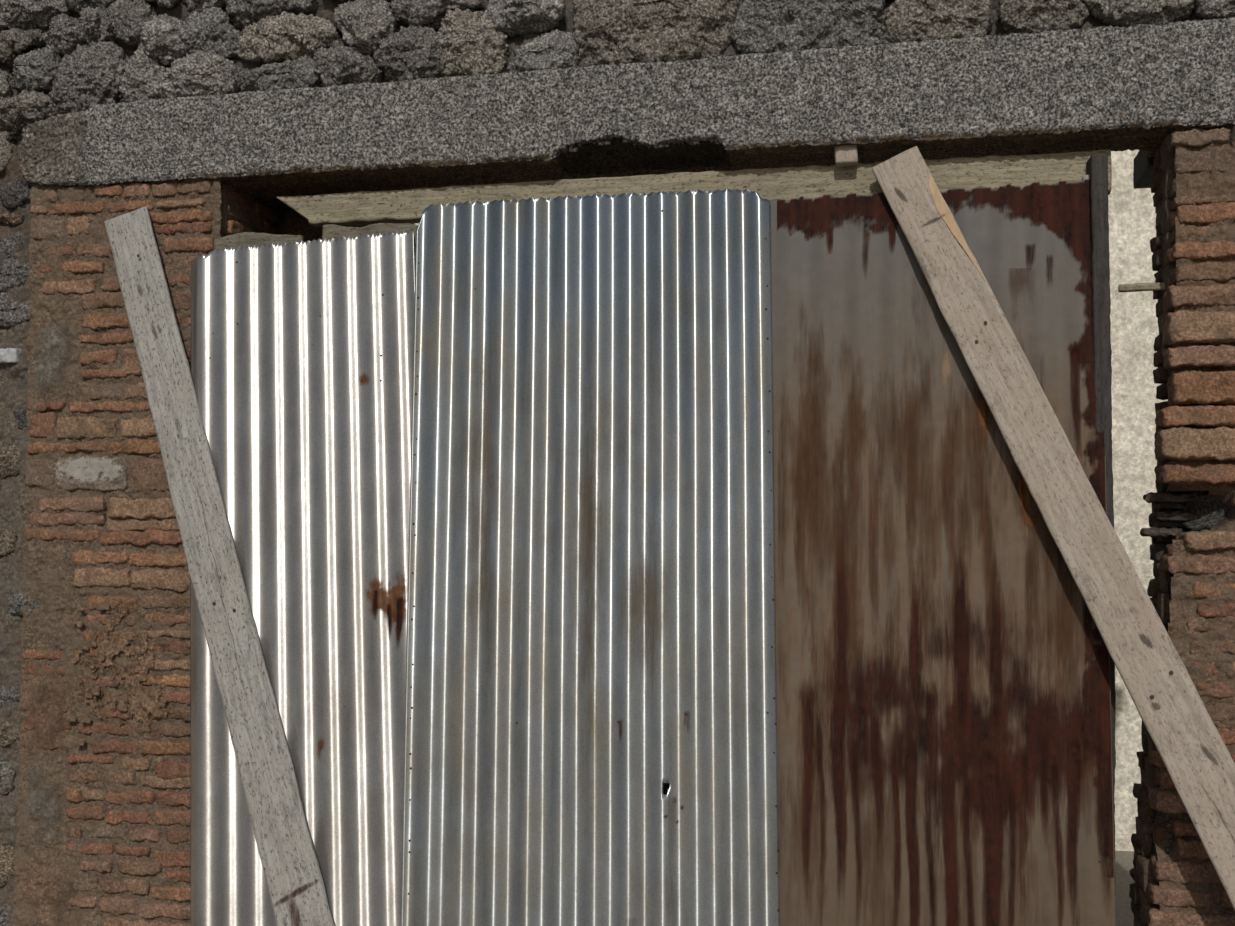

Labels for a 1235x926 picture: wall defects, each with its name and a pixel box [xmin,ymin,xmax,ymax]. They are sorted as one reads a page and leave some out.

rust [777,192,898,265]
rust [941,180,1106,513]
rust [367,578,406,643]
rust [782,349,1114,926]